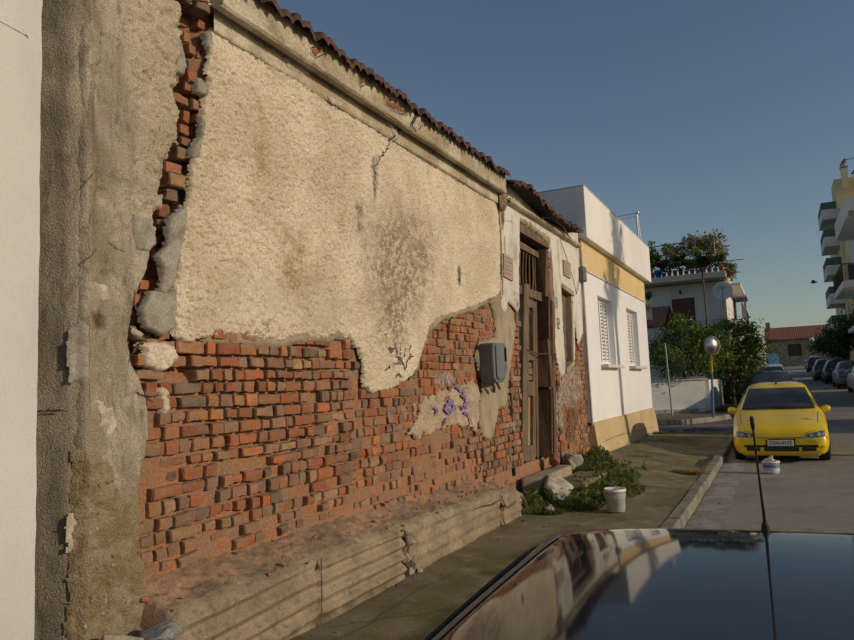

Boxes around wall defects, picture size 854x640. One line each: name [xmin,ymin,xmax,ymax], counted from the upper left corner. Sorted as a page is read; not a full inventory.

crack [374,111,423,179]
peeling [132,213,156,252]
spalling [542,337,590,466]
spalling [63,298,524,640]